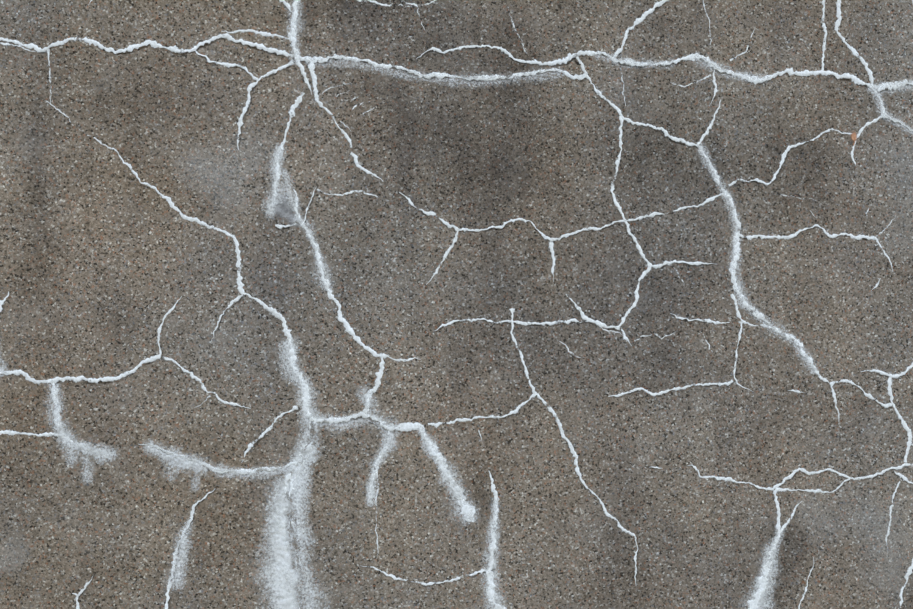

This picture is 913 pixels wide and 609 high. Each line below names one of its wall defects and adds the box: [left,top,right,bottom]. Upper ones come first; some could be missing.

crack [0,0,392,150]
crack [273,92,305,194]
damp [264,146,331,289]
efflorescence [46,384,116,482]
crack [0,296,251,454]
damp [145,339,400,609]
crack [94,137,713,583]
crack [363,471,507,609]
efflorescence [418,428,478,521]
damp [484,499,507,609]
crack [395,0,913,609]
efflorescence [745,529,782,609]